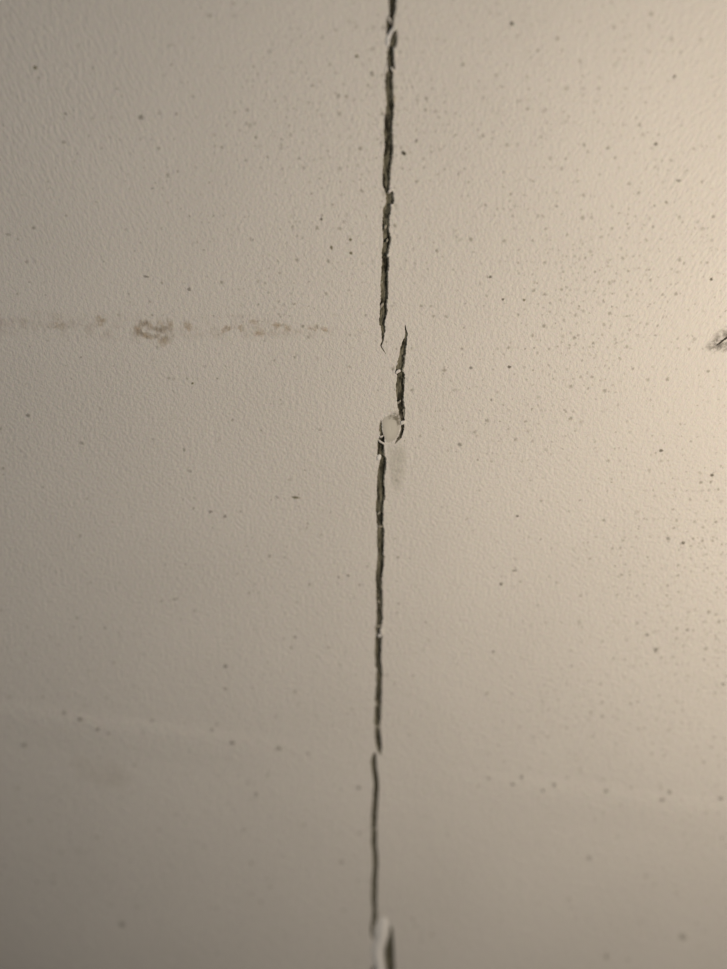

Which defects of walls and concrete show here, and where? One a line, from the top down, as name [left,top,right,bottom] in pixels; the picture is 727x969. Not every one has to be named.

crack [370,0,408,969]